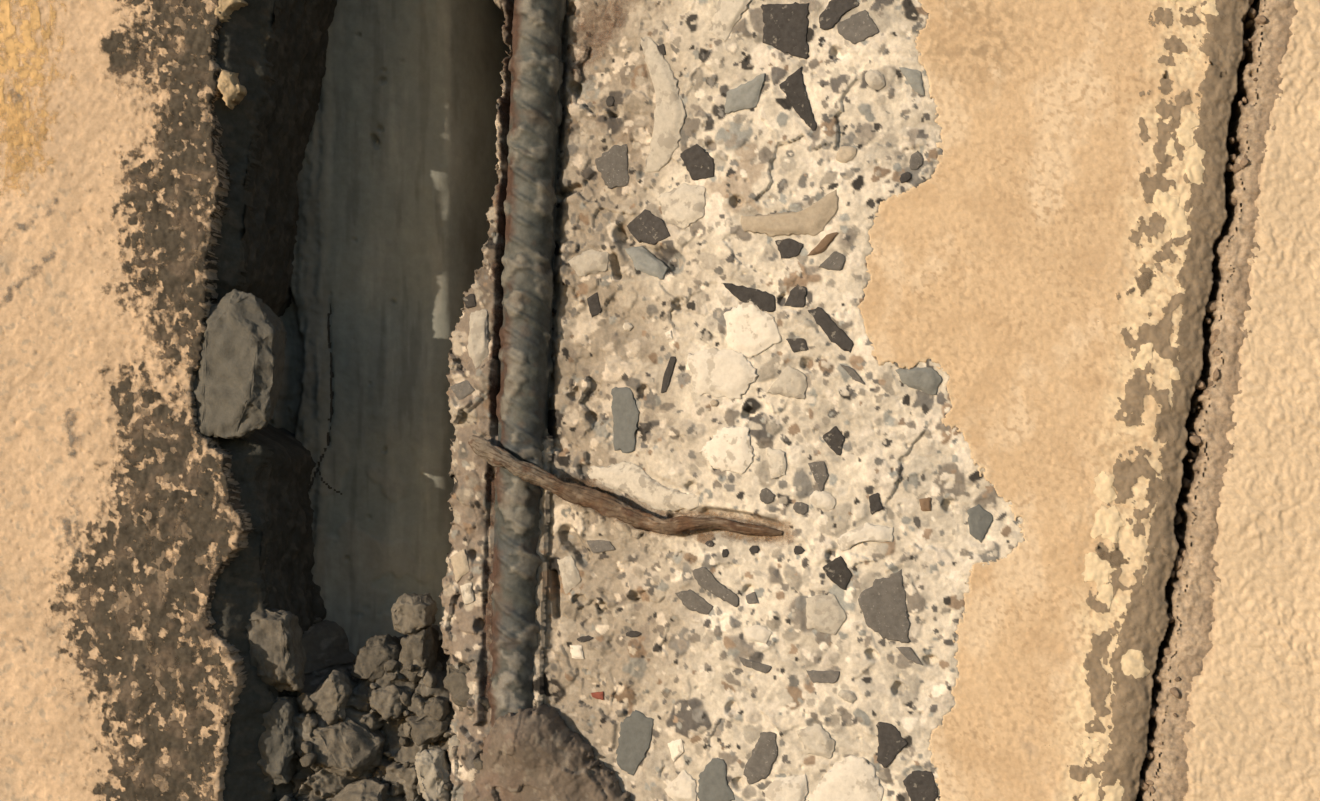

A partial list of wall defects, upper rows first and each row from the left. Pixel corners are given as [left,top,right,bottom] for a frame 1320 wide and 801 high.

flaking render [214,0,248,23]
flaking render [216,69,247,110]
spalling [228,0,1025,801]
crack [1135,0,1298,801]